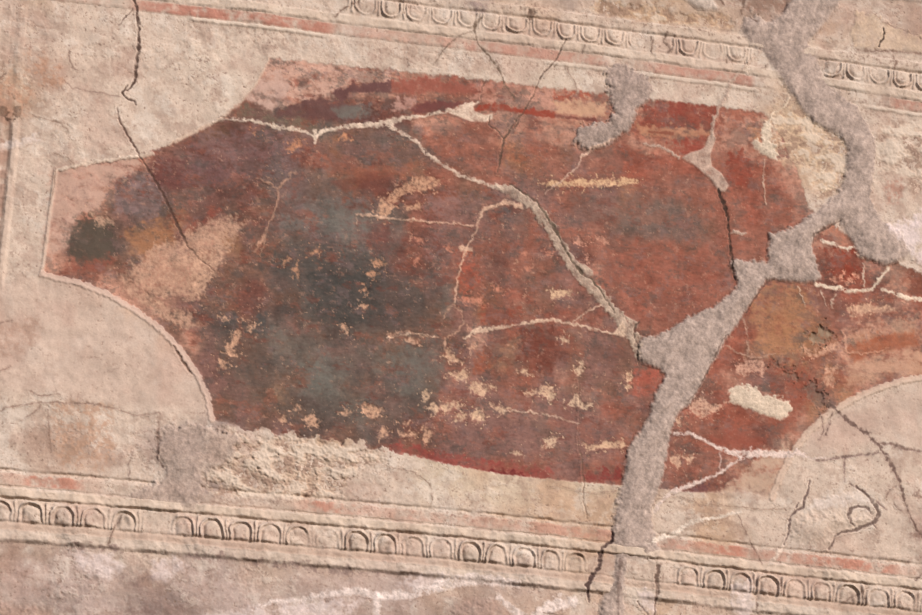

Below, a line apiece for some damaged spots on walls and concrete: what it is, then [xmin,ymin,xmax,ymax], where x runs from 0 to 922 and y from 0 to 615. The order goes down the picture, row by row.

crack [649,30,674,55]
crack [856,11,922,71]
crack [49,0,218,273]
crack [211,15,644,368]
peeling [536,169,646,195]
crack [642,48,922,404]
spalling [750,99,846,204]
peeling [336,249,390,341]
peeling [824,262,897,322]
spalling [205,276,599,503]
flaking render [729,317,844,416]
crack [241,401,922,615]